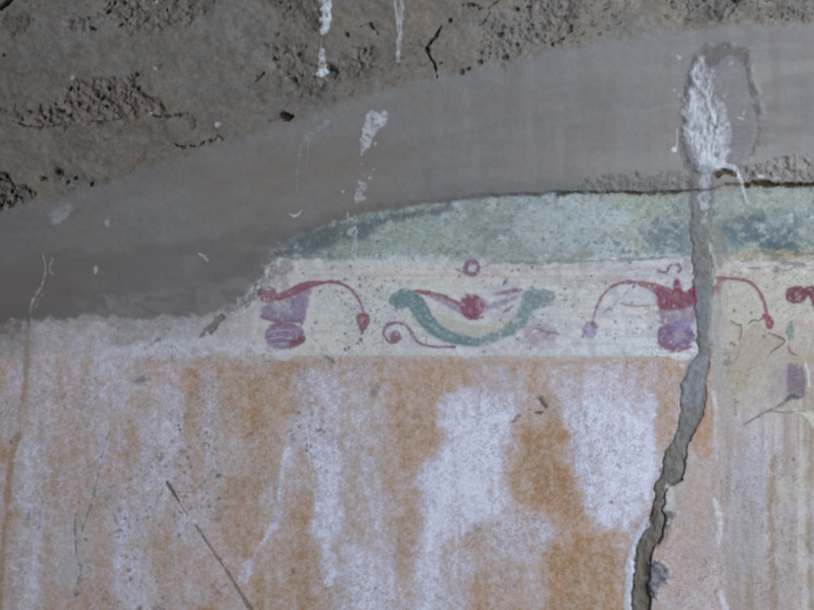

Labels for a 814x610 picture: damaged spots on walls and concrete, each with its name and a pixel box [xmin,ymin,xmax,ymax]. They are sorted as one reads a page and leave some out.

spalling [60,0,216,37]
spalling [255,0,378,105]
damp [315,0,334,78]
damp [393,0,406,64]
spalling [458,0,582,76]
spalling [6,69,189,133]
spalling [0,167,108,212]
damp [277,109,462,299]
damp [669,53,749,228]
spalling [711,152,814,195]
damp [451,320,568,400]
crack [554,171,814,610]